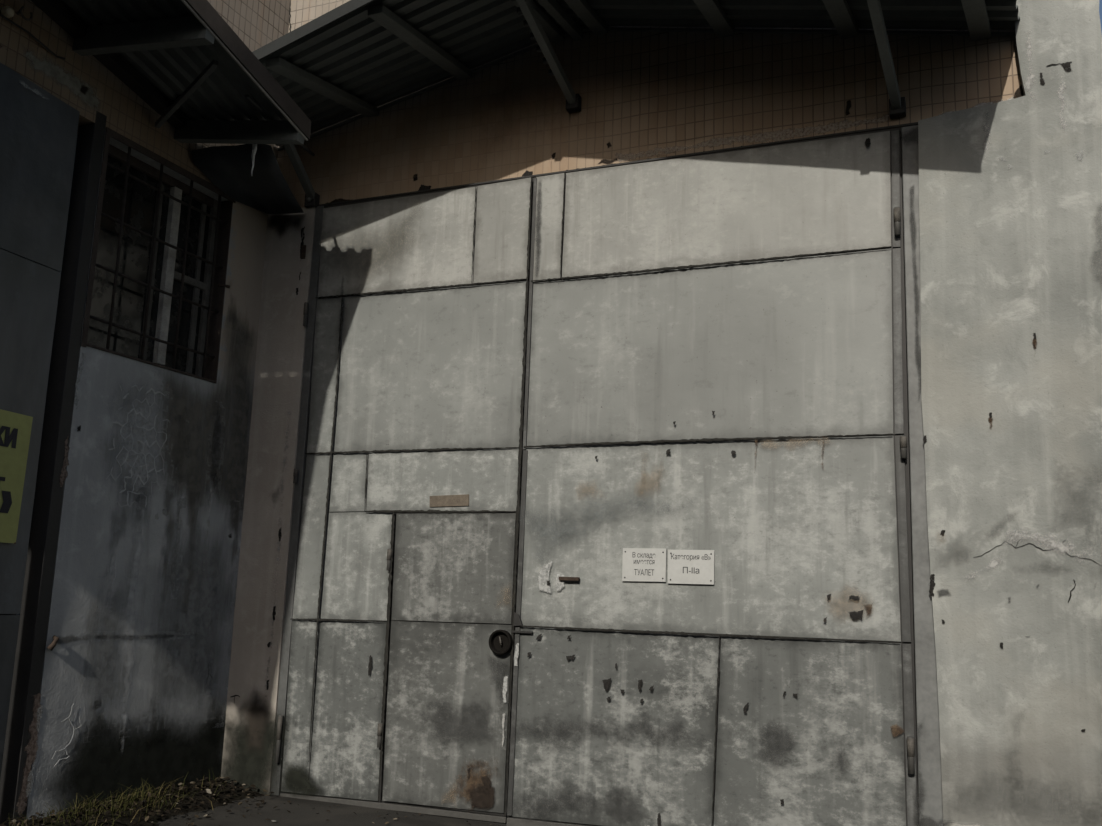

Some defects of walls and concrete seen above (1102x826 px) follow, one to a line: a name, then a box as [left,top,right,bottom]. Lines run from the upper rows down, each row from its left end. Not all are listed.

water stain [112,312,253,694]
crack [973,540,1098,603]
rust [849,595,872,620]
water stain [55,695,287,811]
rust [451,761,495,810]